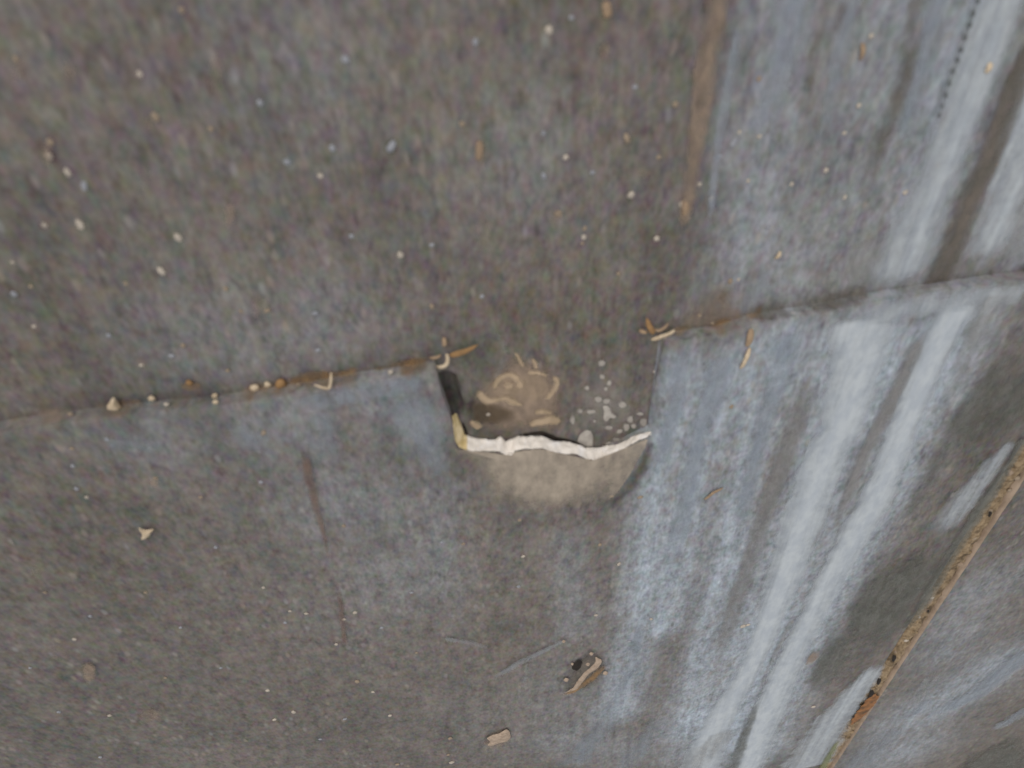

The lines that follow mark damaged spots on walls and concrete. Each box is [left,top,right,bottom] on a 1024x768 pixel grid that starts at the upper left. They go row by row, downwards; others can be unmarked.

damp [682,0,725,221]
damp [877,0,1021,279]
spalling [452,361,651,506]
damp [679,49,1024,768]
rust [851,694,879,725]